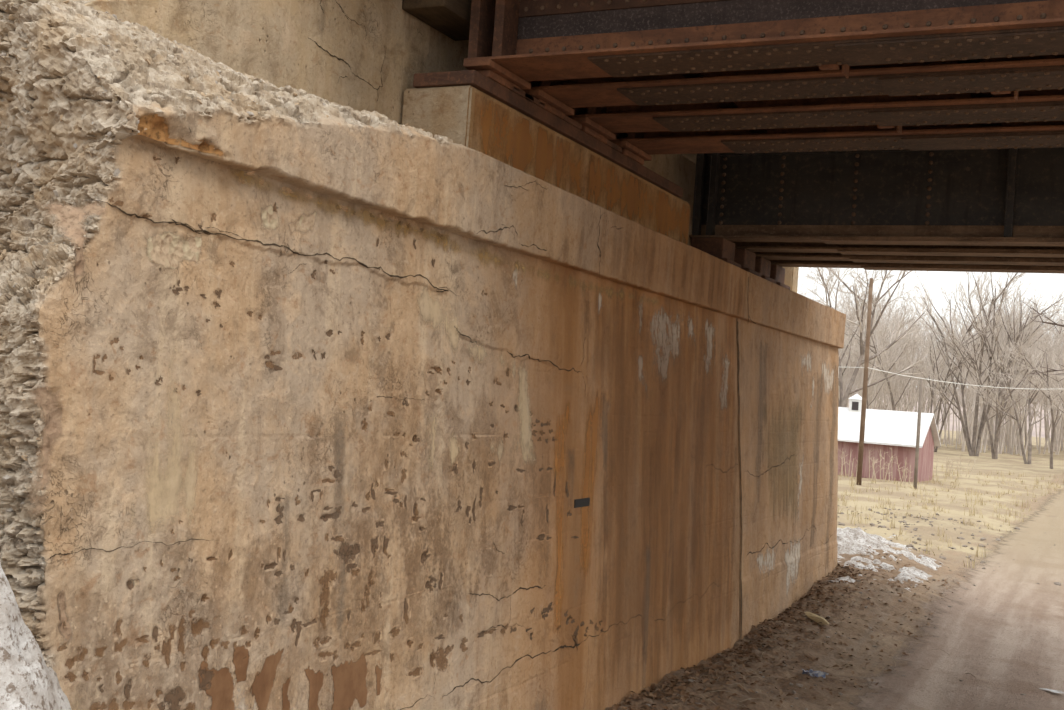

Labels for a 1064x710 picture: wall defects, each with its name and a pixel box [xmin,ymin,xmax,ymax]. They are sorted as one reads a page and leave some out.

crack [309,0,386,101]
crack [84,200,459,296]
spalling [0,0,533,710]
damp [639,301,714,381]
peeling [489,402,557,443]
crack [400,277,835,710]
crack [50,539,209,558]
damp [754,537,801,592]